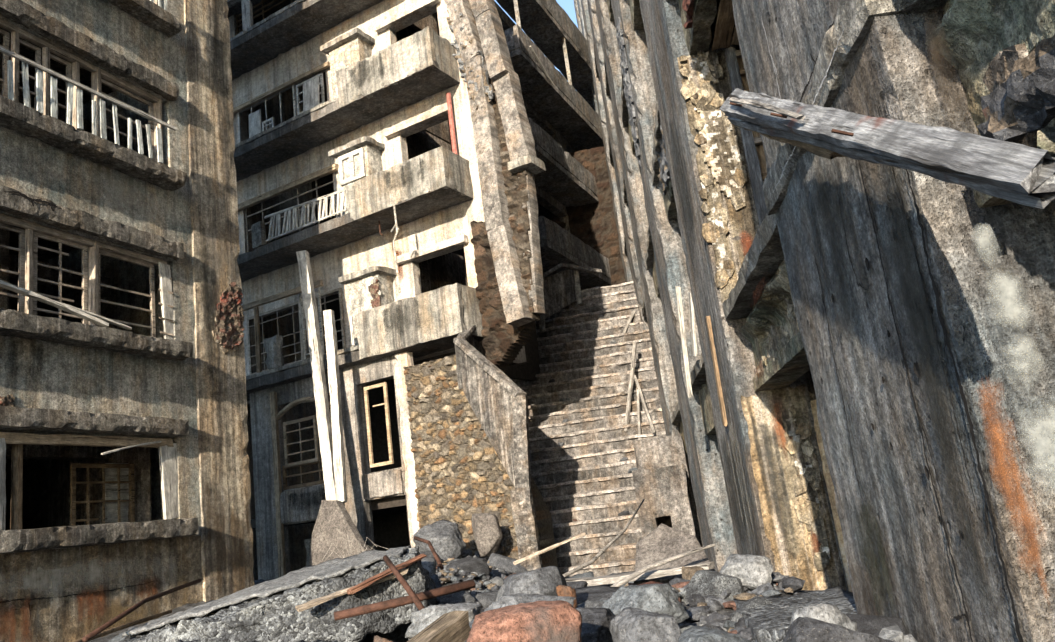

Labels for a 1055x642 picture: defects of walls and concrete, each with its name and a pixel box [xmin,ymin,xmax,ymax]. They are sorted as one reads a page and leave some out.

spalling [682,0,694,29]
peeling [679,50,747,289]
crack [760,8,843,103]
spalling [976,34,1055,148]
spalling [212,282,245,353]
crack [834,160,973,642]
crack [894,169,1023,642]
rust [984,387,1040,569]